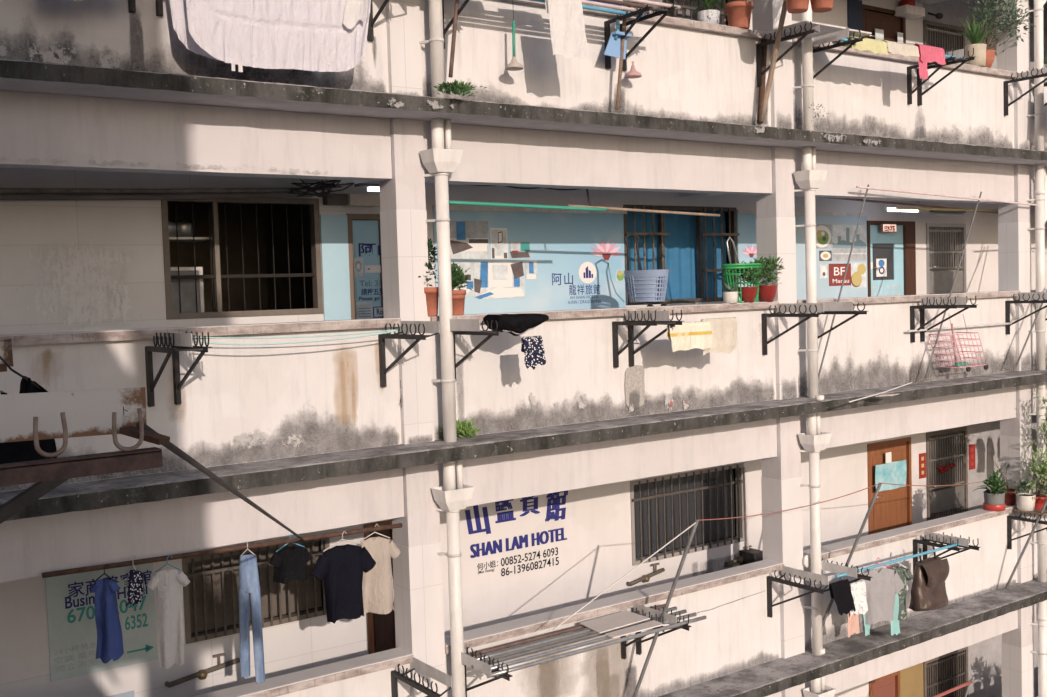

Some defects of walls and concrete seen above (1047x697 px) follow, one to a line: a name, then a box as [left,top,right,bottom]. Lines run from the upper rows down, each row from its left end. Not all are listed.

peeling [28,41,77,64]
peeling [97,53,121,69]
damp [0,14,385,93]
damp [445,90,518,104]
damp [579,90,682,119]
damp [700,93,1047,151]
damp [457,354,1047,437]
damp [62,420,444,484]